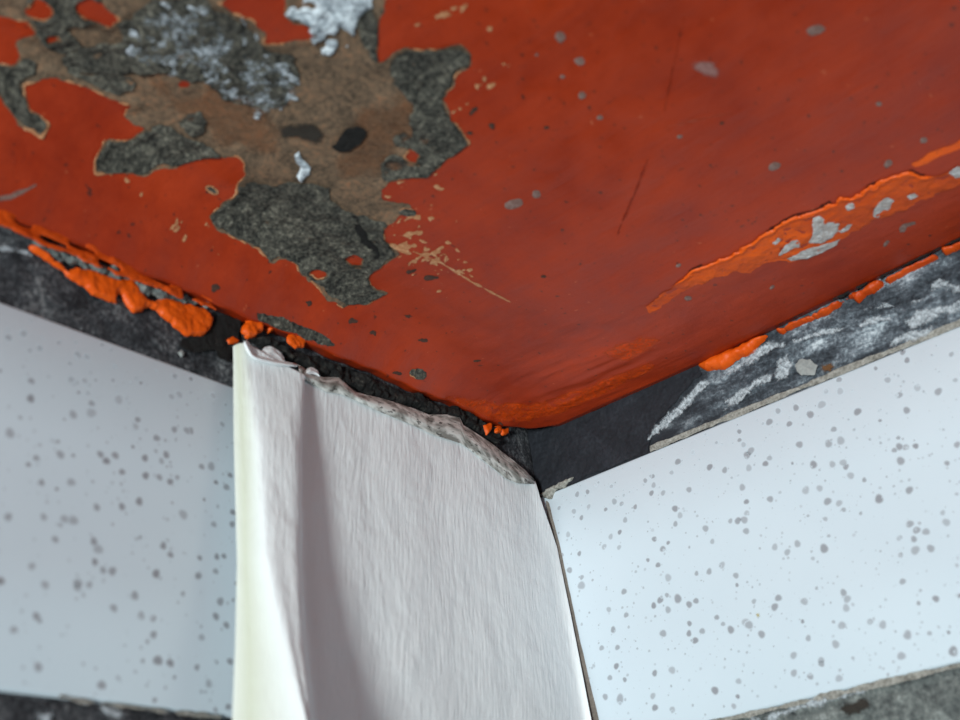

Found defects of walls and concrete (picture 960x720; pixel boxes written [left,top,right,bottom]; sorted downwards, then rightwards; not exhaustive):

peeling [0,0,473,308]
peeling [0,210,242,363]
peeling [646,137,960,313]
peeling [392,368,427,380]
peeling [451,364,652,426]
leakage [527,365,709,493]
leakage [725,328,843,405]
leakage [768,690,869,720]